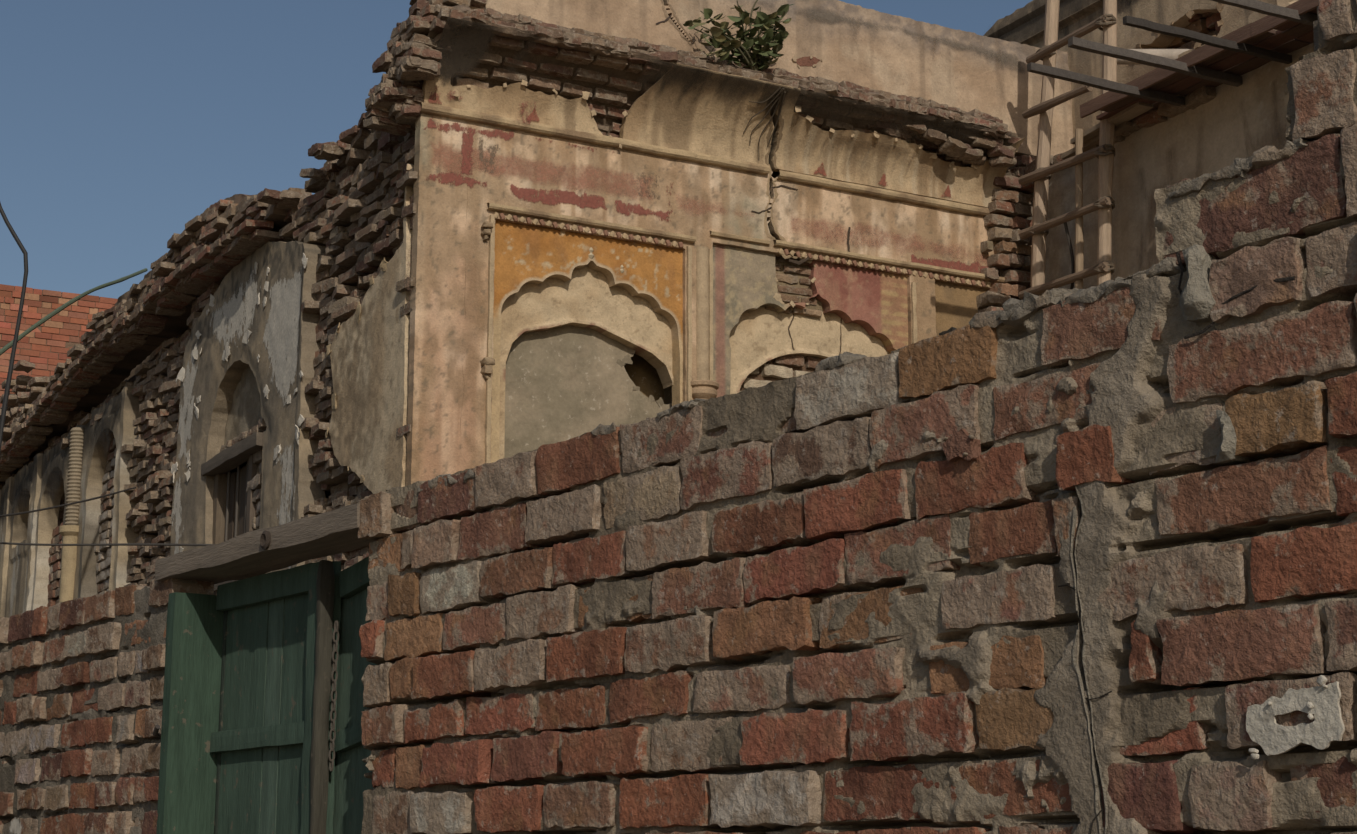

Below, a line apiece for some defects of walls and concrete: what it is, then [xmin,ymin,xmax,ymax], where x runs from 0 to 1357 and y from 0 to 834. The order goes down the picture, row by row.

crack [656,0,699,52]
spalling [449,35,656,149]
spalling [794,102,992,170]
spalling [0,129,418,587]
crack [1055,484,1112,834]
peeling [1246,675,1345,759]